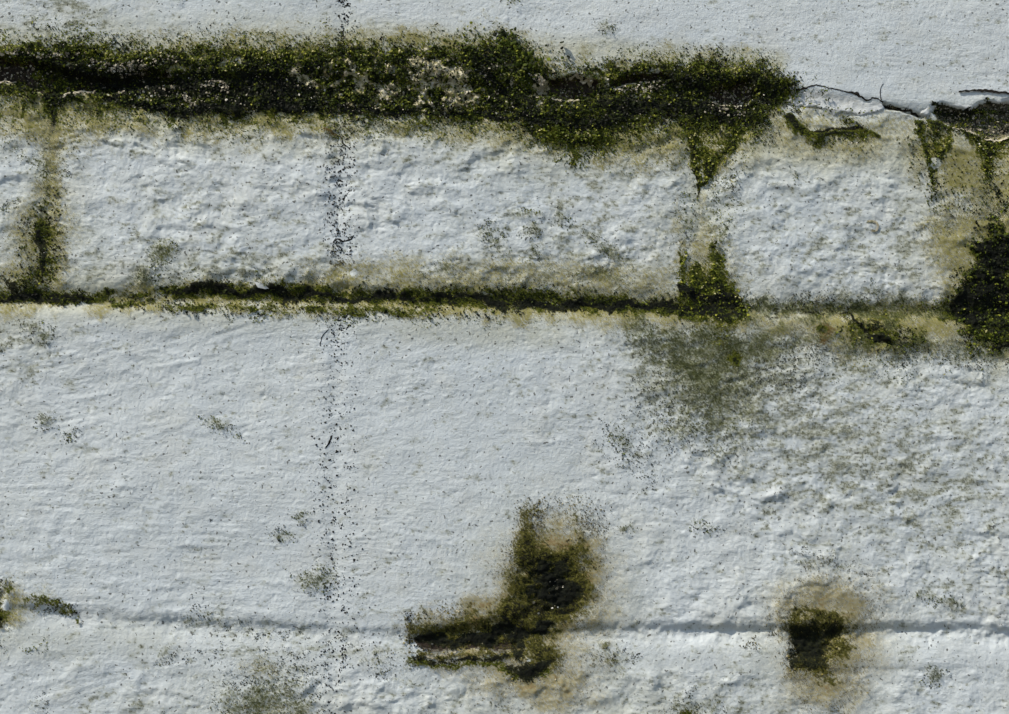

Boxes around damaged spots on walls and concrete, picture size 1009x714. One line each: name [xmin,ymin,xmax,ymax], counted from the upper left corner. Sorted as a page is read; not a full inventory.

peeling [780,75,885,119]
spalling [919,89,1009,142]